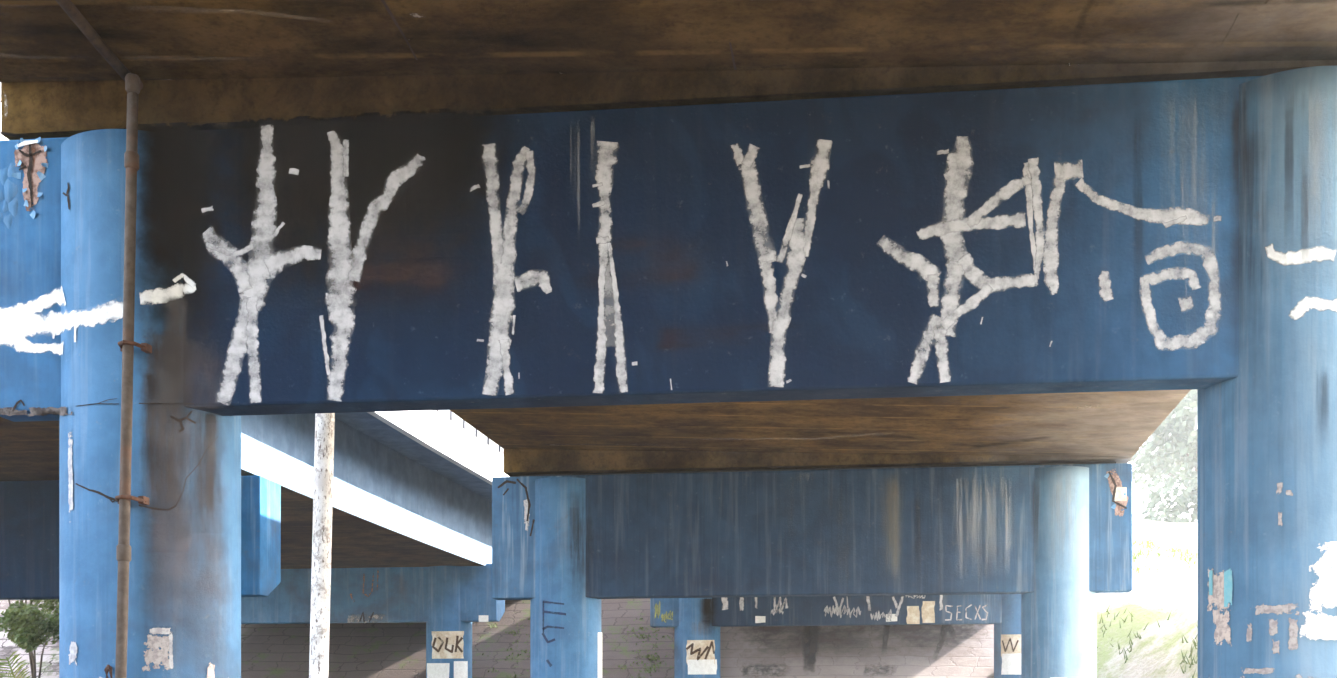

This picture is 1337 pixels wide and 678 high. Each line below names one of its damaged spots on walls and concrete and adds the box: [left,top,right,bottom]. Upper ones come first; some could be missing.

spalling [12,137,48,219]
peeling [1209,569,1232,607]
peeling [68,641,77,665]
peeling [142,628,173,672]
peeling [1242,603,1300,674]